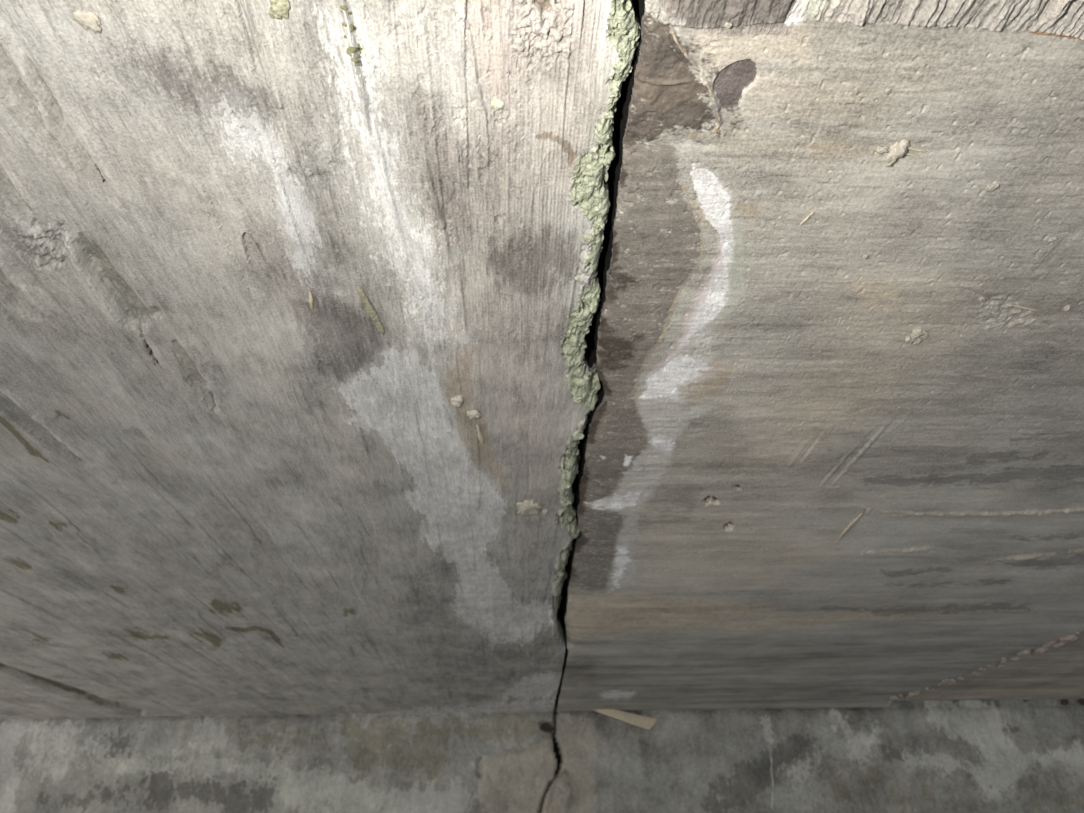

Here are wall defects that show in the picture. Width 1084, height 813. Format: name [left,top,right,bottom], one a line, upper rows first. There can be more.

damp [99,0,840,657]
crack [539,0,645,813]